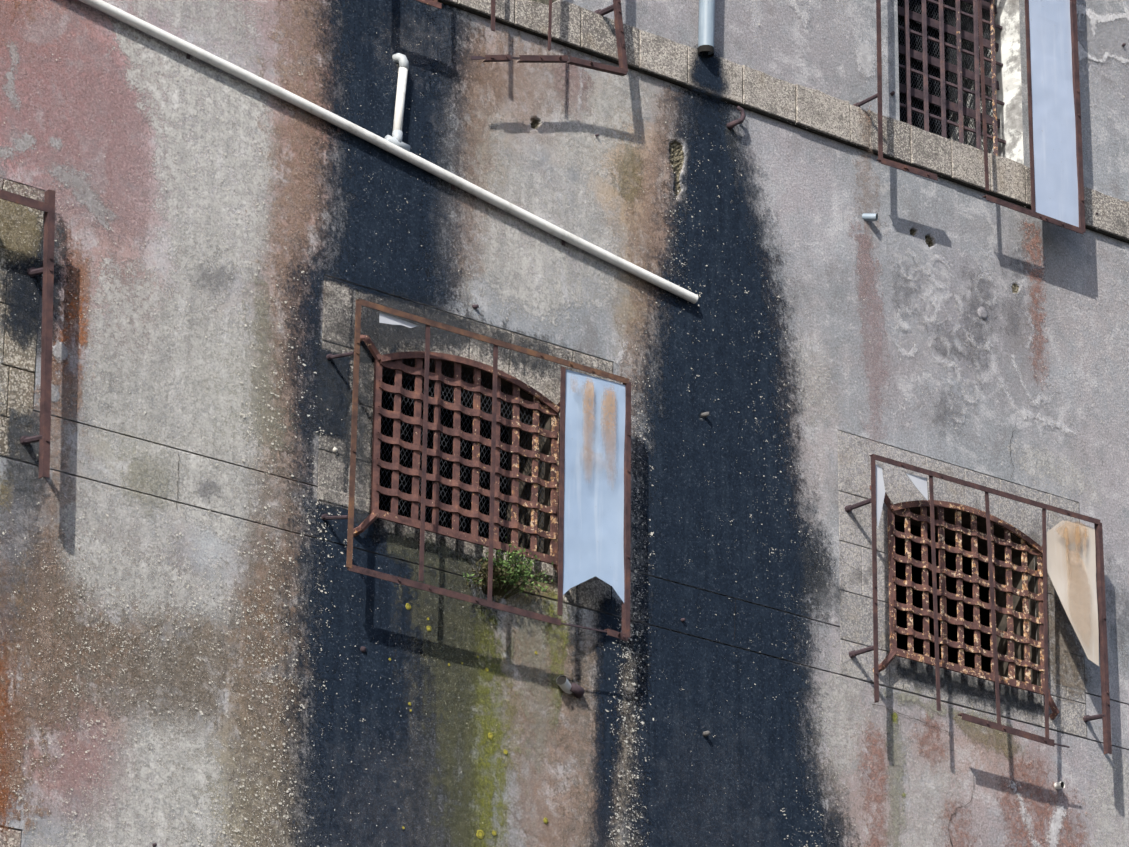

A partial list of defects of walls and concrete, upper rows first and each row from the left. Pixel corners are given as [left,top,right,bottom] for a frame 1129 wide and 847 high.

crack [1076,0,1129,64]
damp [1,213,74,362]
damp [0,403,47,583]
damp [228,0,554,847]
damp [540,46,851,847]
rust [0,637,76,832]
crack [933,768,974,846]